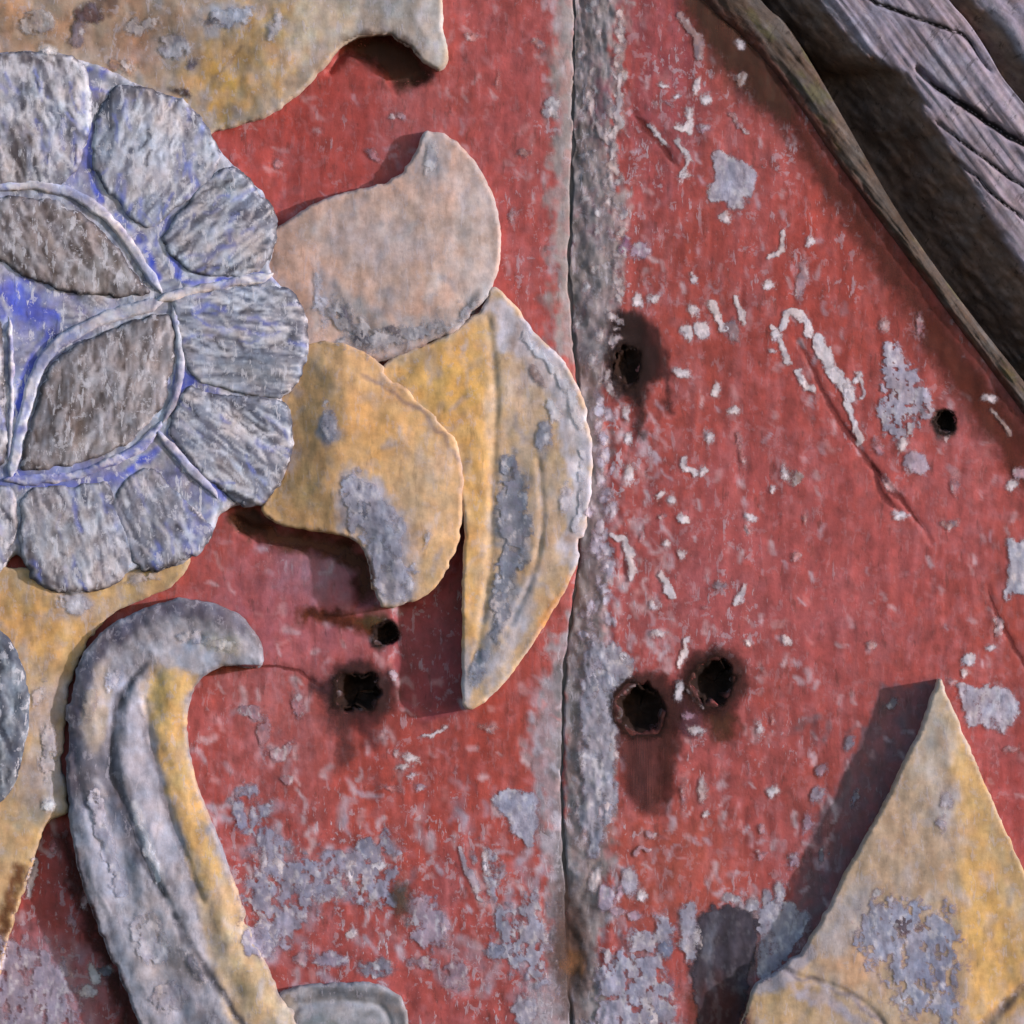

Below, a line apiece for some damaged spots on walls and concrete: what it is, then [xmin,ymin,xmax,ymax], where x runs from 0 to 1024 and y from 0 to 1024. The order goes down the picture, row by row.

peeling [579,0,660,347]
peeling [707,149,757,223]
peeling [679,295,746,342]
peeling [769,236,935,475]
crack [808,361,920,523]
peeling [340,467,417,602]
spalling [521,330,810,1024]
peeling [948,653,1020,752]
peeling [227,784,468,991]
peeling [458,846,560,1024]
peeling [492,788,542,848]
peeling [853,888,969,1024]